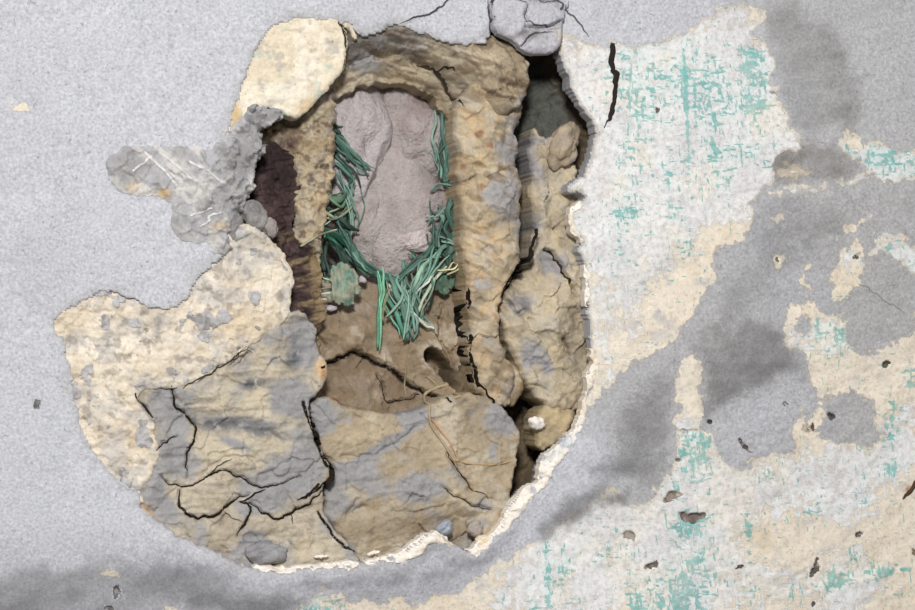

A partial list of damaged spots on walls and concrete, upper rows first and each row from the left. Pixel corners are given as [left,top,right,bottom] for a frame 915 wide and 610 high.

crack [402,0,448,23]
crack [520,0,589,45]
crack [416,65,465,107]
crack [604,42,620,128]
peeling [835,128,915,187]
spalling [54,4,828,574]
crack [452,287,495,404]
crack [321,351,452,403]
peeling [296,214,915,610]
crack [156,347,354,551]
crack [445,453,492,510]
peeling [100,569,121,610]